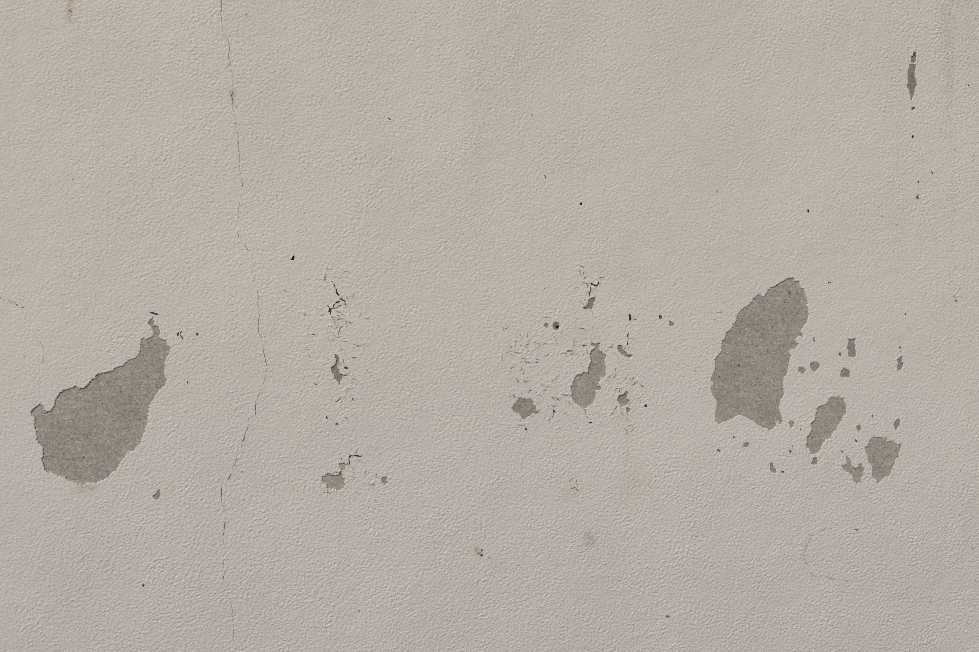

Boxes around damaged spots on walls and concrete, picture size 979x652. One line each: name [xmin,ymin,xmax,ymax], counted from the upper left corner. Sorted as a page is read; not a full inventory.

peeling [907,53,917,100]
peeling [31,317,171,485]
peeling [322,463,348,490]
peeling [331,355,343,385]
peeling [512,397,540,419]
peeling [571,343,606,409]
peeling [711,278,820,430]
peeling [806,396,847,465]
peeling [842,419,902,484]